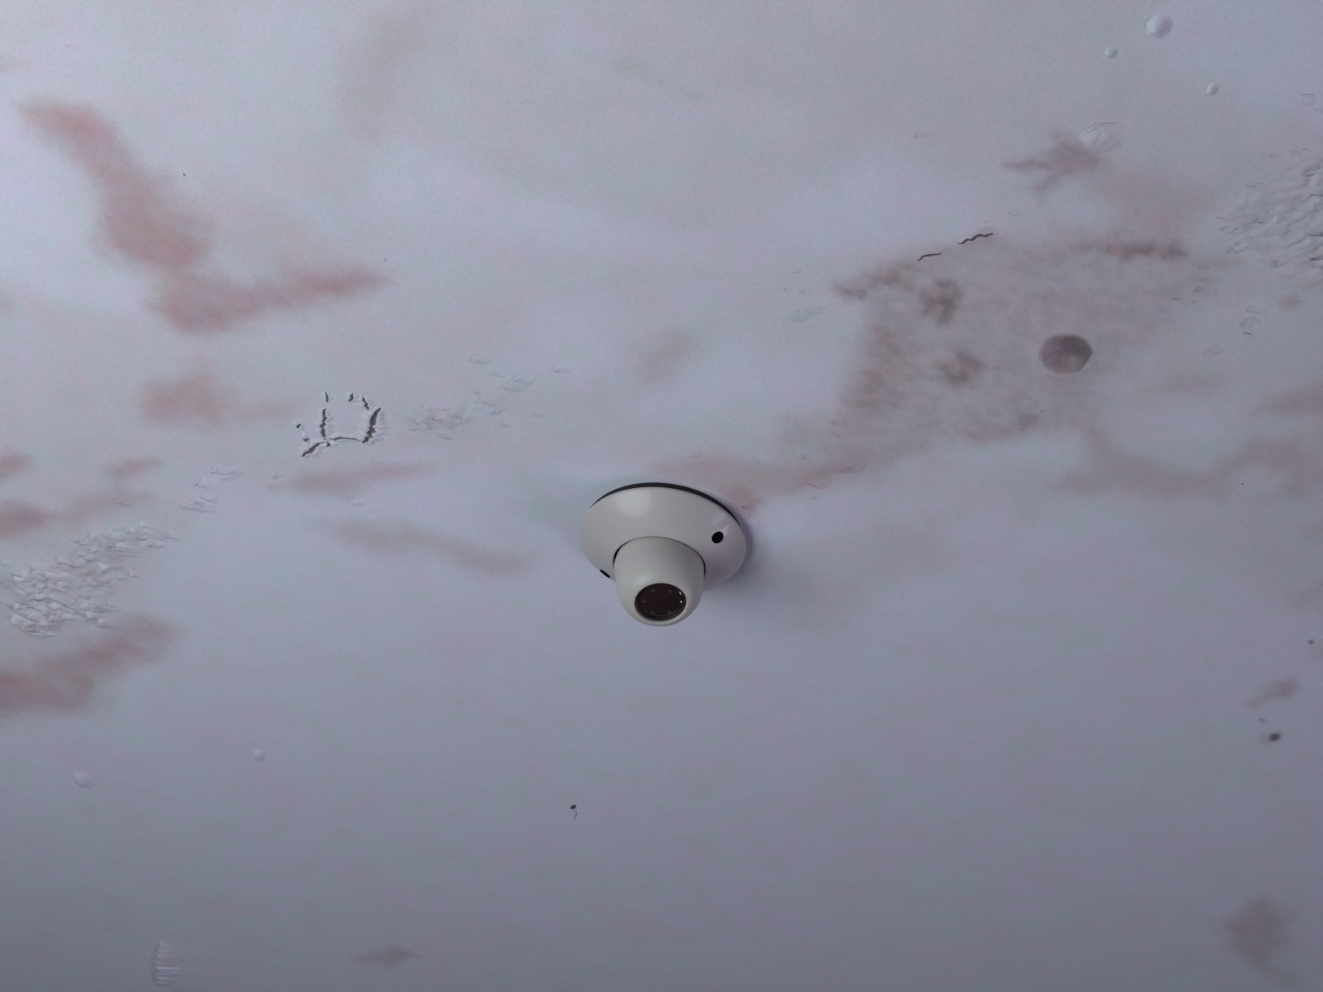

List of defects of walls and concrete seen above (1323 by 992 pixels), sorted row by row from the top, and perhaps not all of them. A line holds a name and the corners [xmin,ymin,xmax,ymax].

leakage [744,117,1323,469]
hole [1027,325,1104,382]